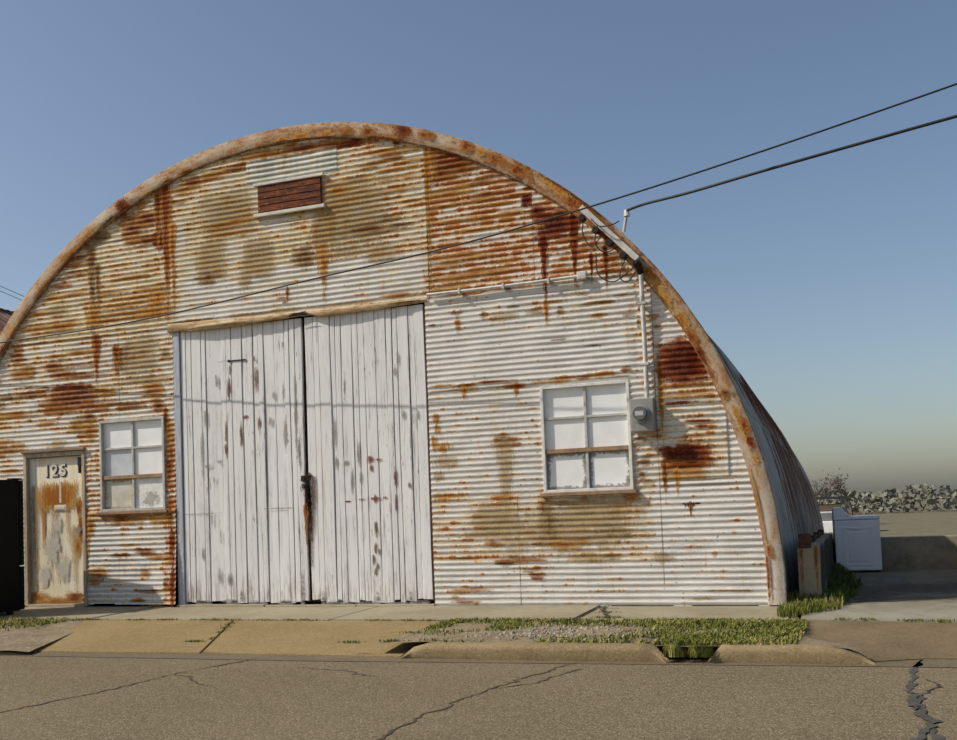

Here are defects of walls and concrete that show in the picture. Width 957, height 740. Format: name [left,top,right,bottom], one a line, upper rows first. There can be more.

peeling [215,365,231,401]
rust [0,124,820,607]
peeling [200,411,228,483]
peeling [240,377,302,470]
peeling [333,420,411,511]
peeling [372,522,381,575]
water stain [464,496,644,552]